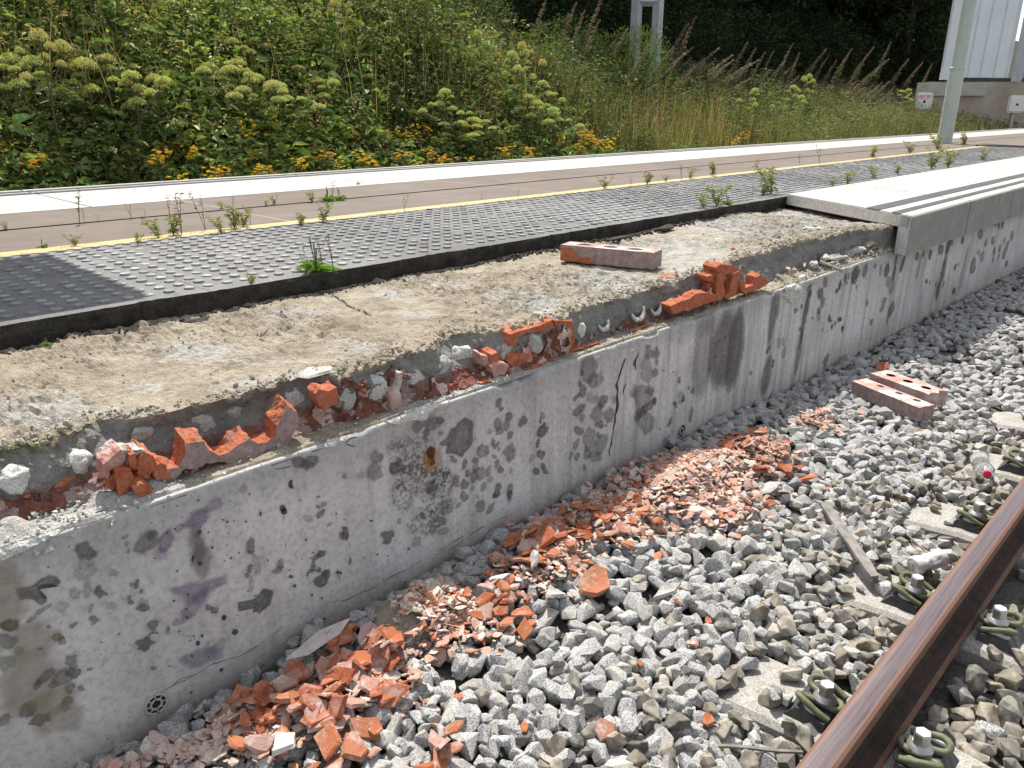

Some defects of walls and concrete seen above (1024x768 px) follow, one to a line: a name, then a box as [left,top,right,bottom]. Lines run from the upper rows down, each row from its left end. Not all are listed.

water stain [709,308,751,386]
crack [609,353,639,456]
rust [424,446,435,472]